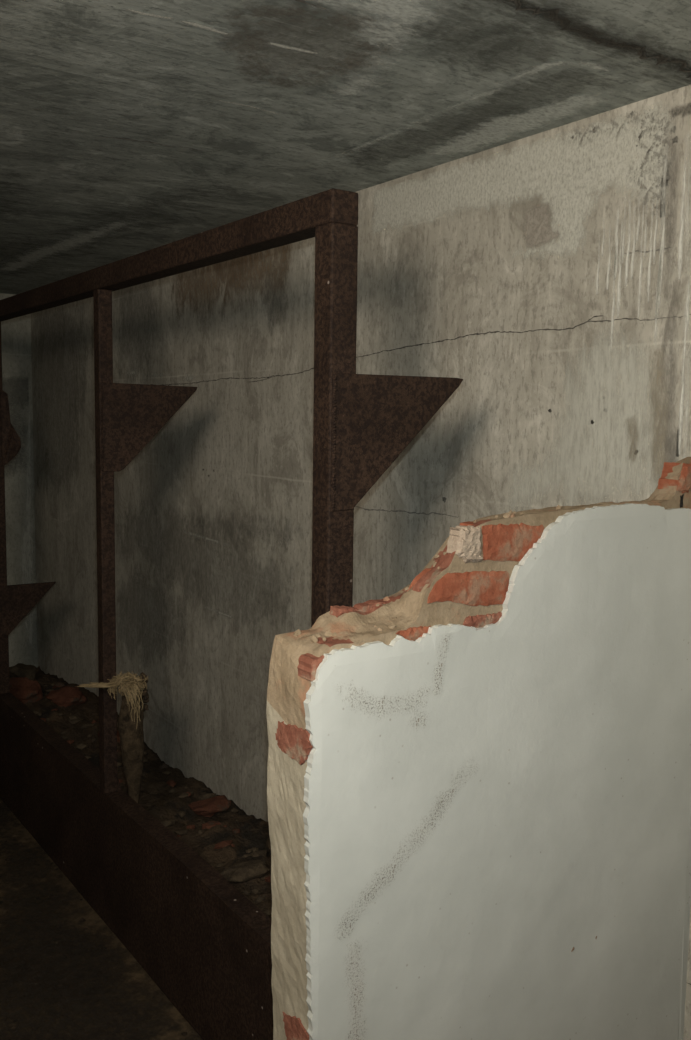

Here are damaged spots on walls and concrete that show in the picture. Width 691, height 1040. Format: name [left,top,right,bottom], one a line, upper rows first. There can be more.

leakage [318,0,439,100]
crack [356,314,691,358]
crack [150,368,314,385]